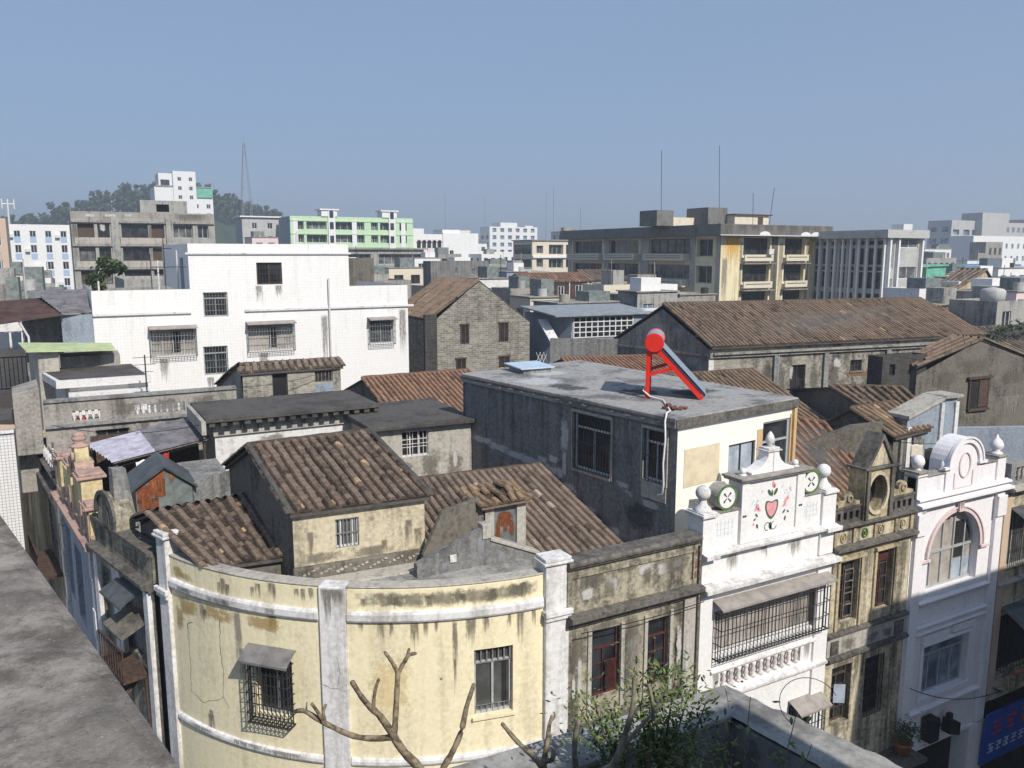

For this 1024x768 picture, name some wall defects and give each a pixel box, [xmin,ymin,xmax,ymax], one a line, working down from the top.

leakage [722,225,833,297]
leakage [362,582,531,606]
crack [187,620,229,707]
leakage [440,617,489,680]